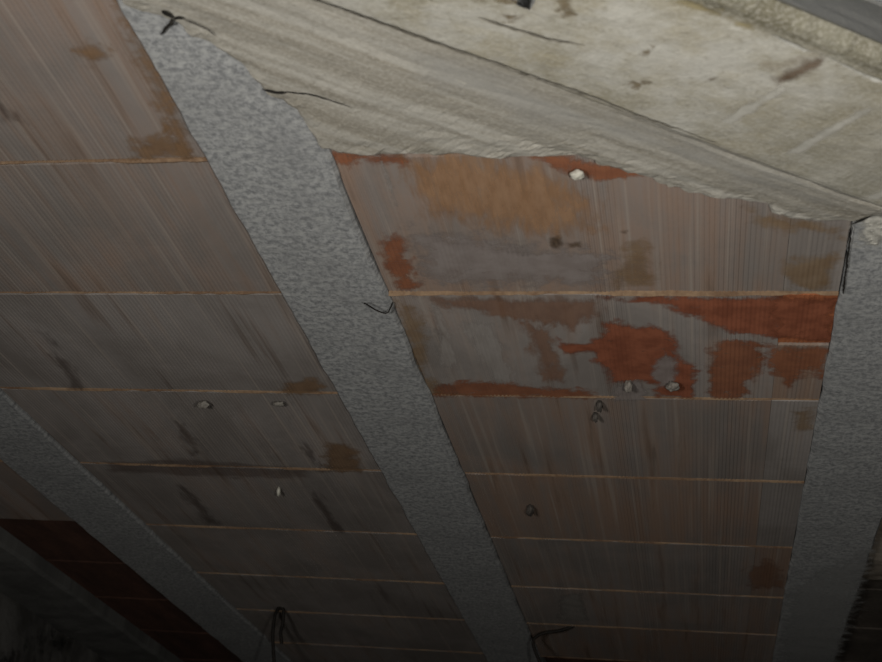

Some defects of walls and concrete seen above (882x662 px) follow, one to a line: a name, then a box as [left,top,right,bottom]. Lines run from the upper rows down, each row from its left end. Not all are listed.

peeling [332,152,408,166]
peeling [533,155,642,180]
peeling [385,236,418,289]
peeling [434,296,838,401]